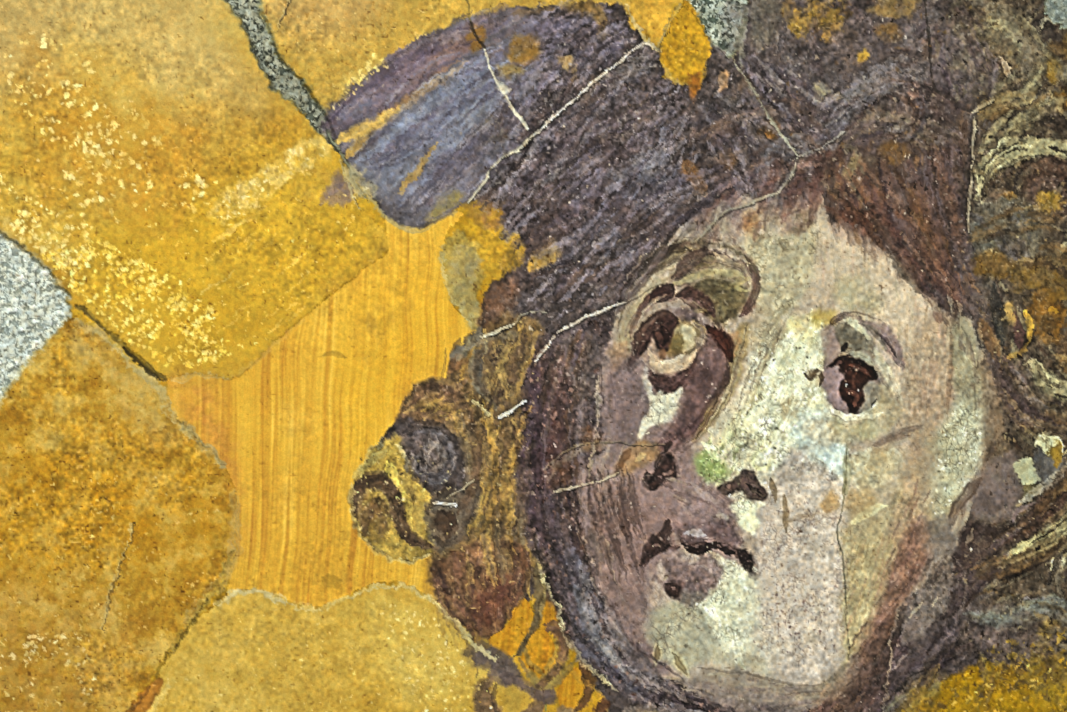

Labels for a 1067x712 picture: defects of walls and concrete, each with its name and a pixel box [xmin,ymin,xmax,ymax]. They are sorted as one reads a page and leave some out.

flaking render [0,32,230,404]
flaking render [179,0,333,226]
crack [467,0,682,204]
flaking render [683,0,748,60]
crack [695,61,845,244]
flaking render [1044,0,1067,30]
crack [480,282,664,363]
crack [836,445,850,660]
crack [127,678,164,712]